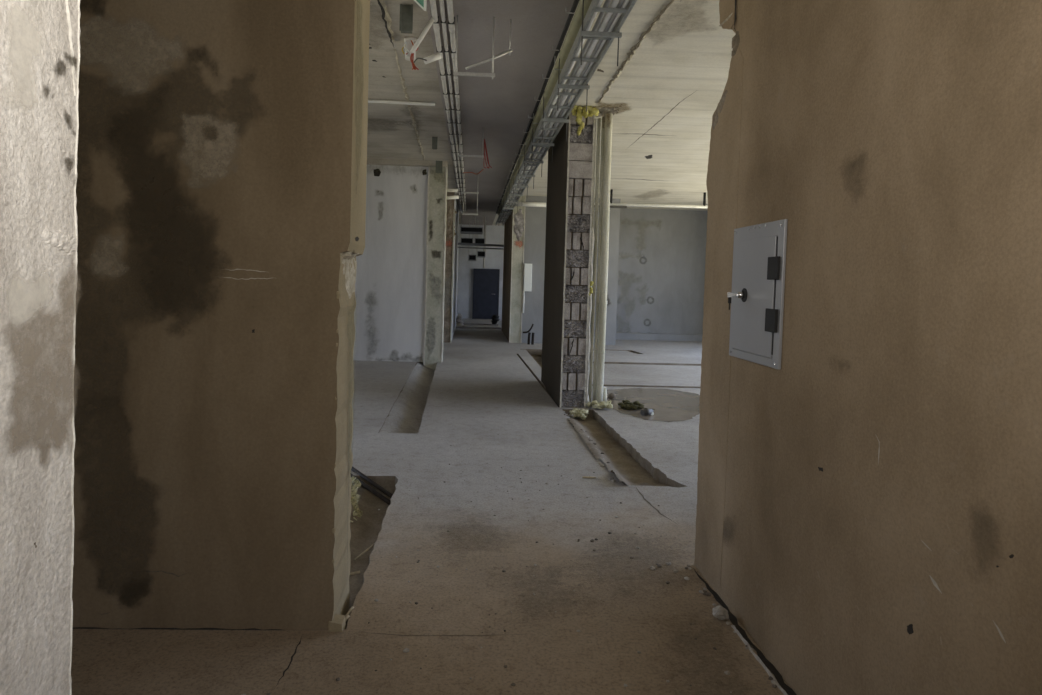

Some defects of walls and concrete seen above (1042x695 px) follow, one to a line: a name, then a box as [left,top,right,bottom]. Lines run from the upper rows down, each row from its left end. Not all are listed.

damp [80,0,104,17]
crack [377,0,394,47]
spalling [340,252,359,299]
damp [10,50,260,606]
crack [273,640,301,690]